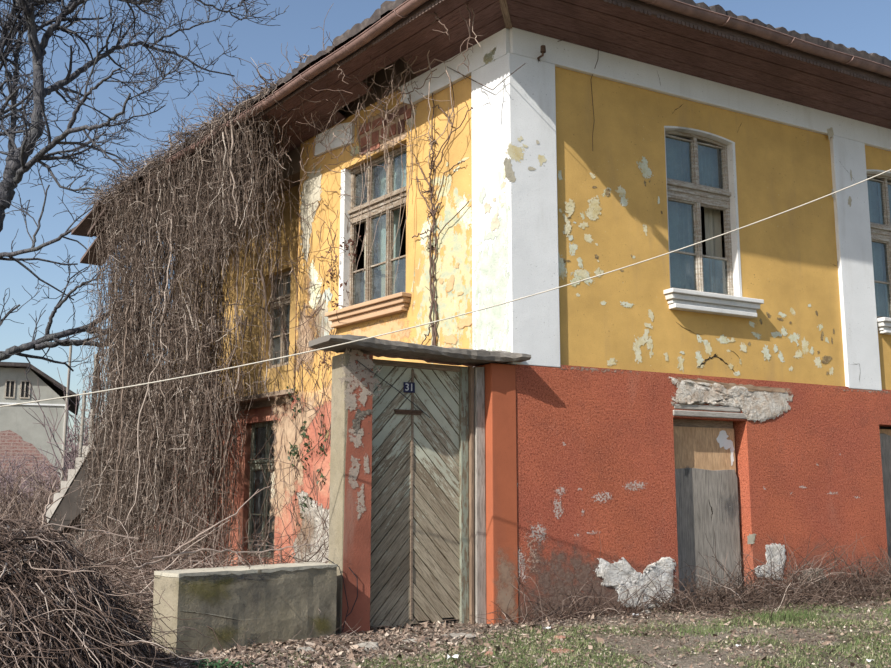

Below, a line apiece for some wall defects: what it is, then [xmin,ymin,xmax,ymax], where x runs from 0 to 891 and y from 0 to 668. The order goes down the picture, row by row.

peeling [637,156,654,186]
peeling [351,136,546,352]
peeling [558,173,628,297]
peeling [295,260,334,372]
crack [697,351,740,374]
spalling [633,304,835,422]
peeling [270,348,384,563]
spalling [593,557,676,610]
spalling [747,533,786,580]